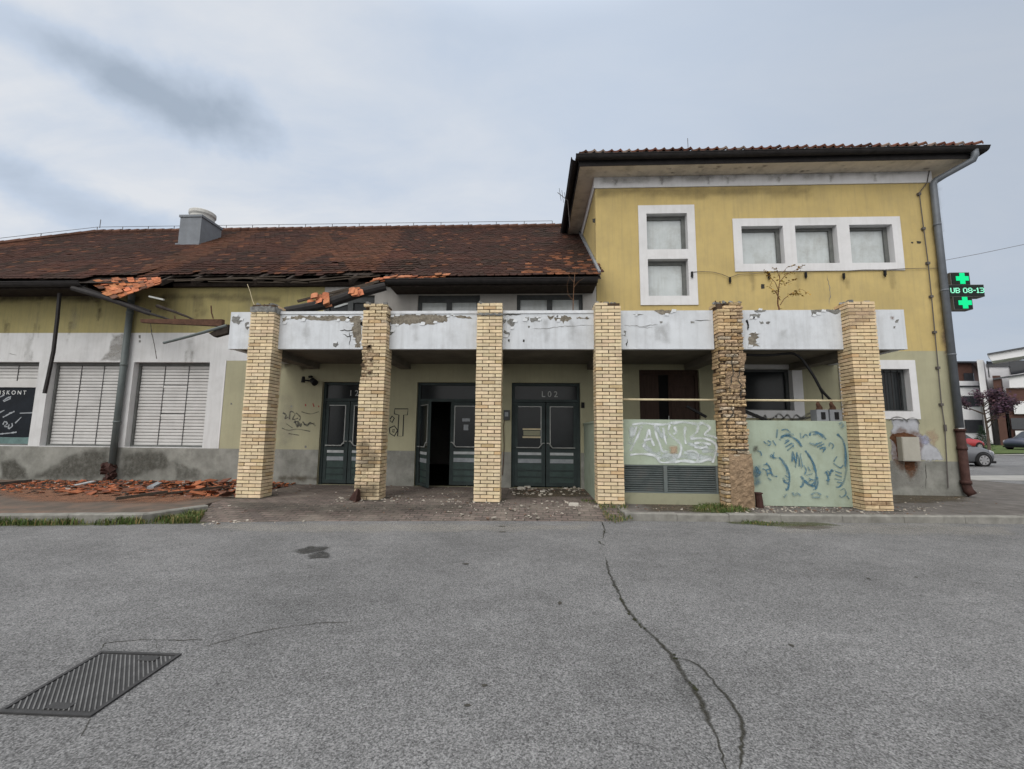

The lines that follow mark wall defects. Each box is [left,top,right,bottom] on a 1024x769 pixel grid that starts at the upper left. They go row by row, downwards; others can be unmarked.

spalling [366,302,472,337]
spalling [503,301,616,342]
spalling [721,308,770,390]
flaking render [890,432,922,476]
crack [600,522,745,769]